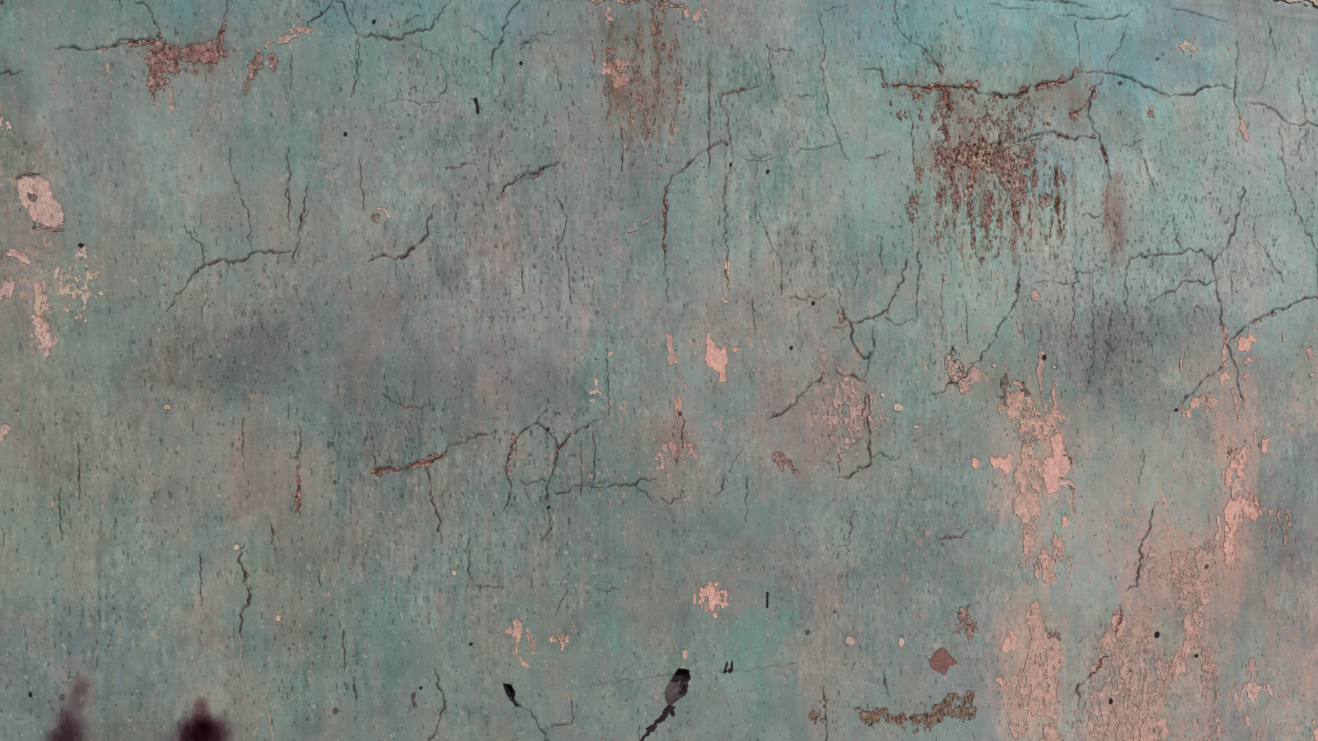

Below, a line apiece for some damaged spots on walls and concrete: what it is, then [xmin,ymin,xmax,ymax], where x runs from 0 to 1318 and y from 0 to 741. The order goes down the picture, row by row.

peeling [15,173,65,232]
peeling [30,242,104,358]
crack [165,184,308,312]
crack [371,453,447,531]
crack [503,361,655,512]
peeling [693,581,733,620]
peeling [703,332,742,382]
crack [771,239,943,418]
peeling [821,363,903,450]
crack [879,0,1318,406]
peeling [944,345,1298,741]
peeling [1175,322,1257,422]